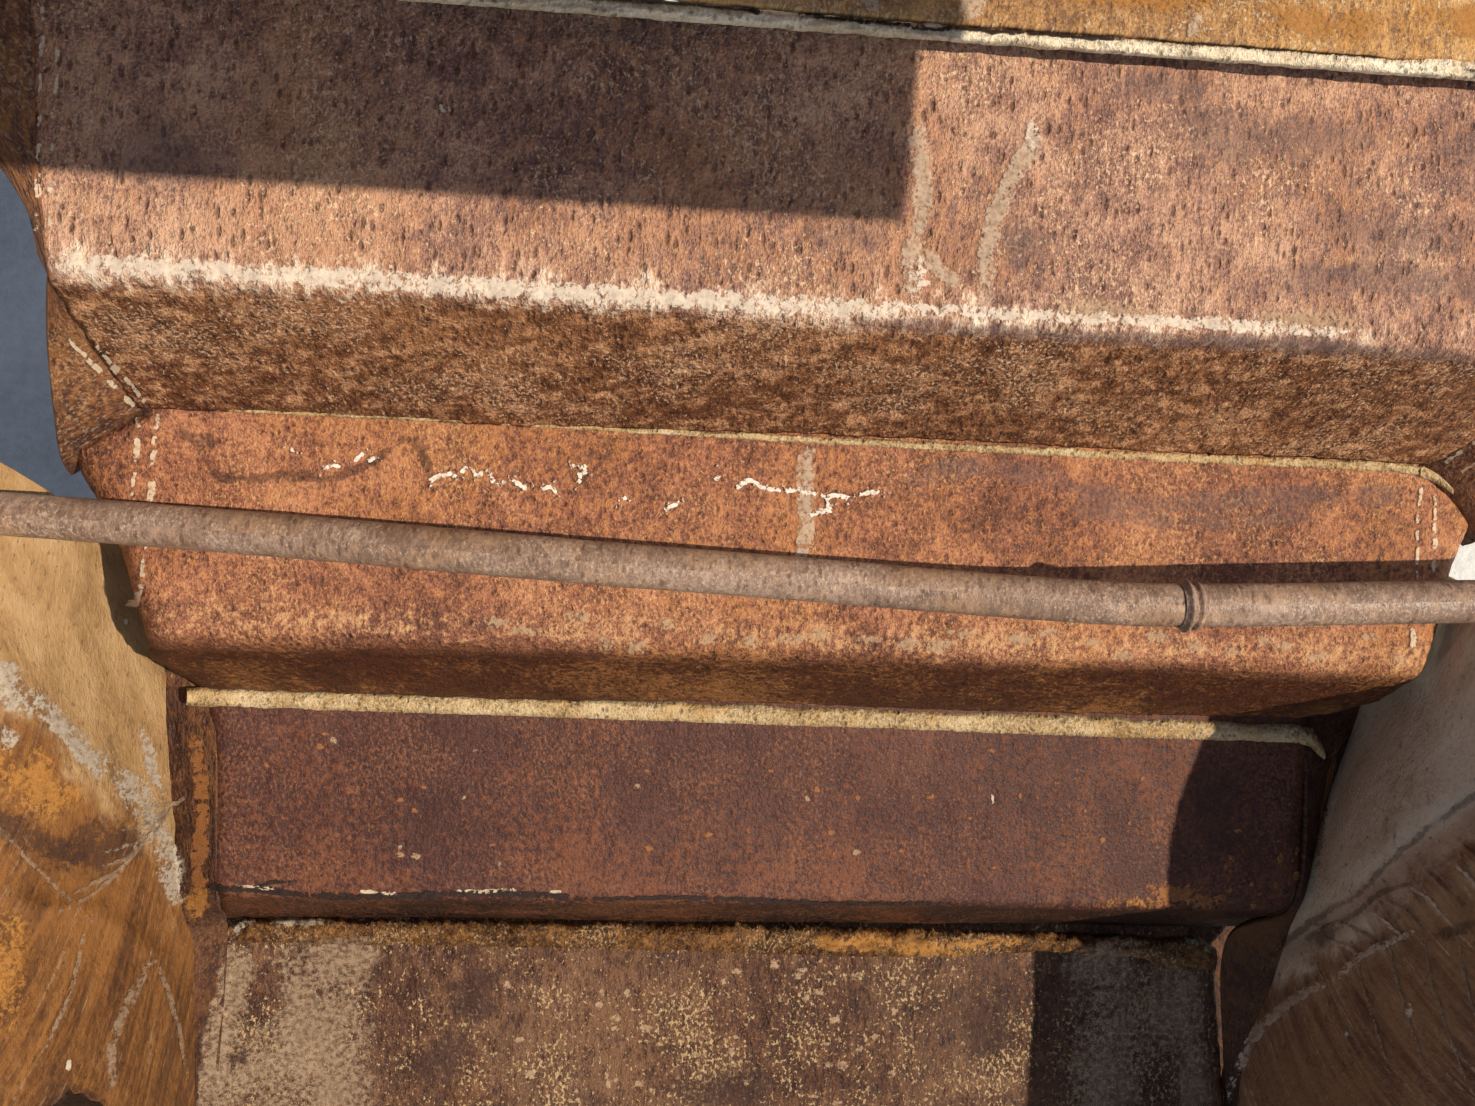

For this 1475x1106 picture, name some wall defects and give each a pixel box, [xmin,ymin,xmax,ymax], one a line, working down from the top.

rust [1249,0,1391,38]
rust [186,889,206,916]
rust [820,932,1021,957]